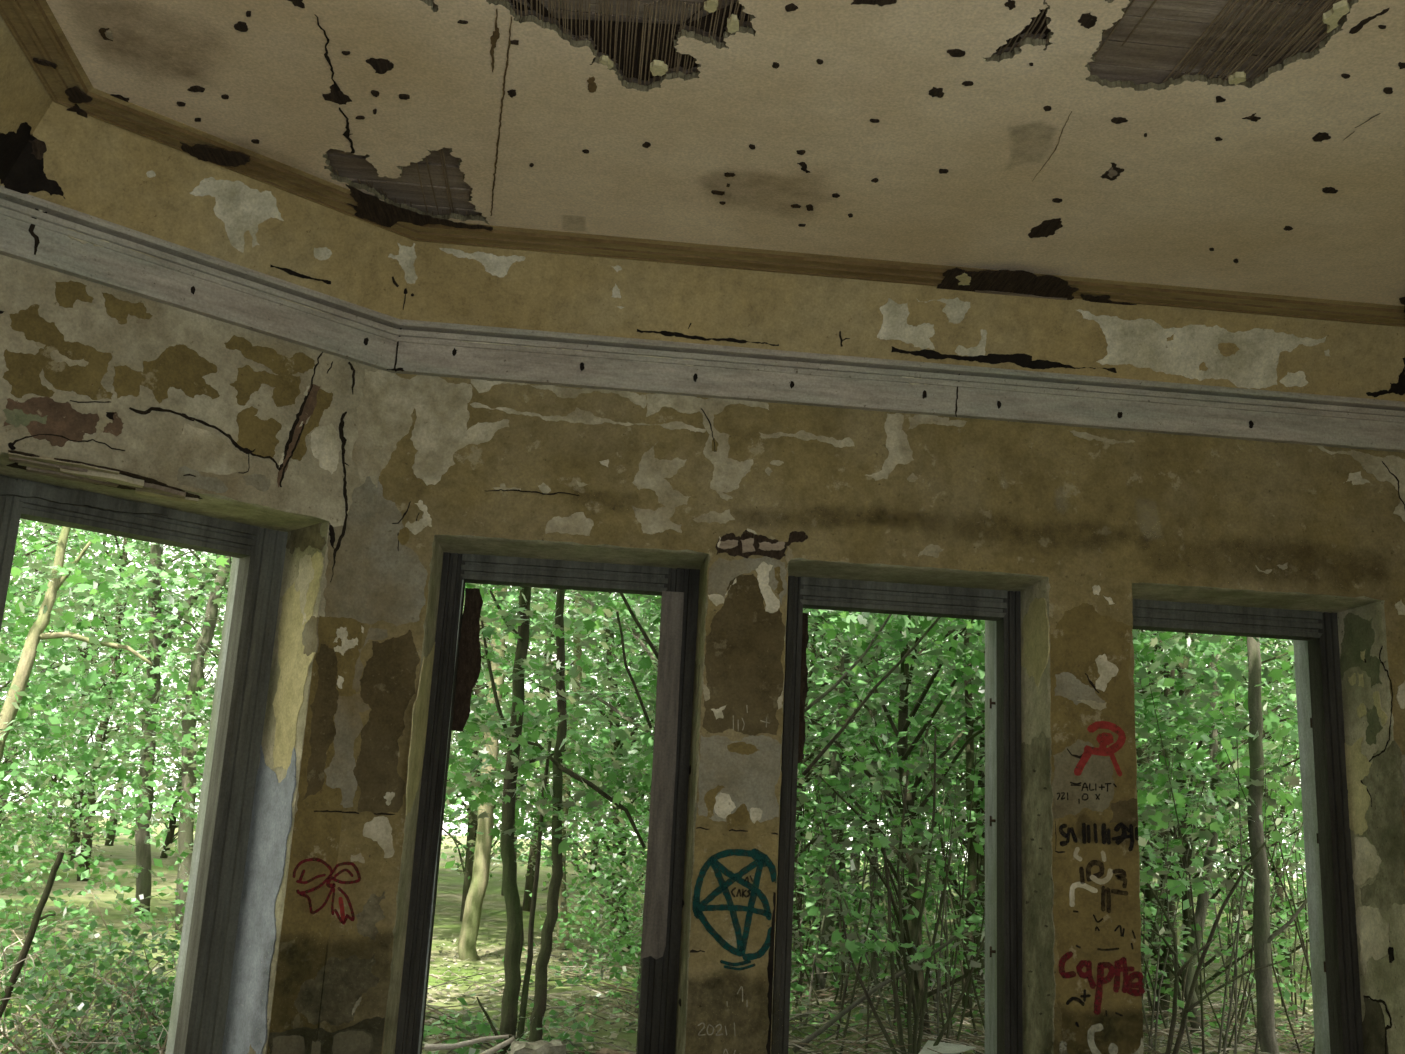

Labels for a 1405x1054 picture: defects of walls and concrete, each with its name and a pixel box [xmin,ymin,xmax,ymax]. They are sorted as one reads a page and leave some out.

crack [314,14,355,154]
flaking render [486,0,756,93]
flaking render [982,0,1054,66]
flaking render [1078,0,1390,103]
flaking render [0,122,65,199]
flaking render [323,147,493,284]
crack [8,434,125,451]
crack [70,277,414,582]
peeling [877,267,1330,389]
crack [1366,358,1405,397]
peeling [273,368,808,815]
flaking render [1340,612,1405,976]